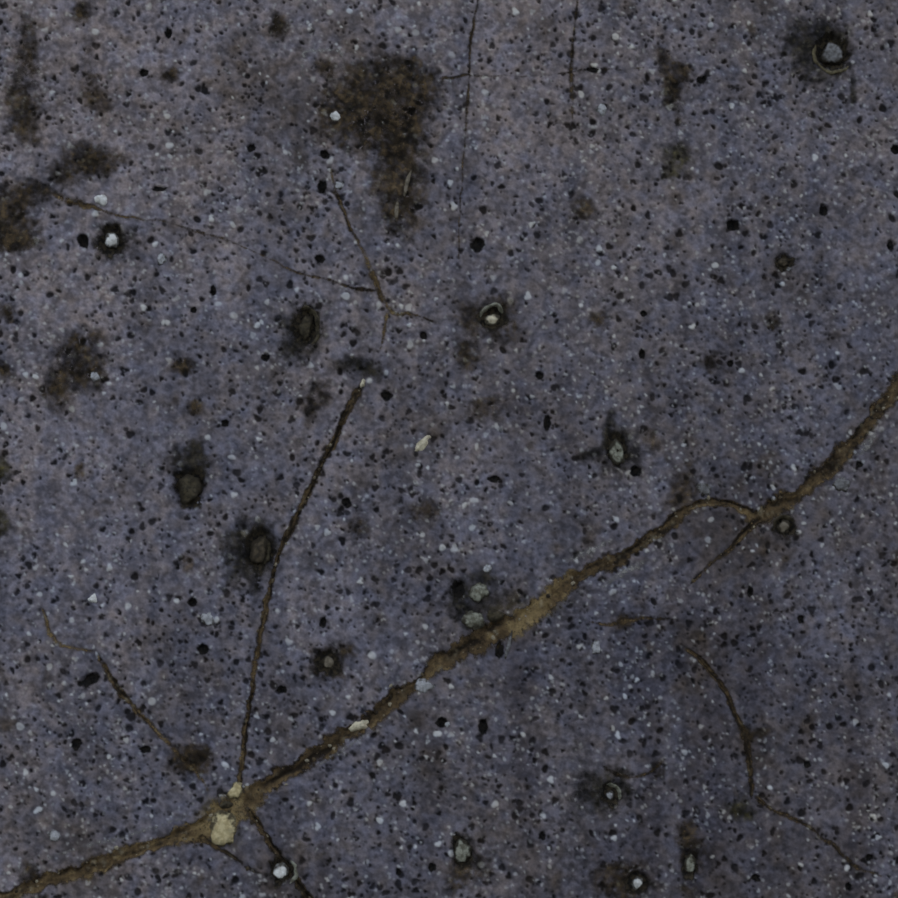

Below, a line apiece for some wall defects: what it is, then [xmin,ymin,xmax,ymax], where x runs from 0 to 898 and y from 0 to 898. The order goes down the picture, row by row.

leakage [316,55,443,235]
crack [54,168,433,349]
crack [0,372,898,898]